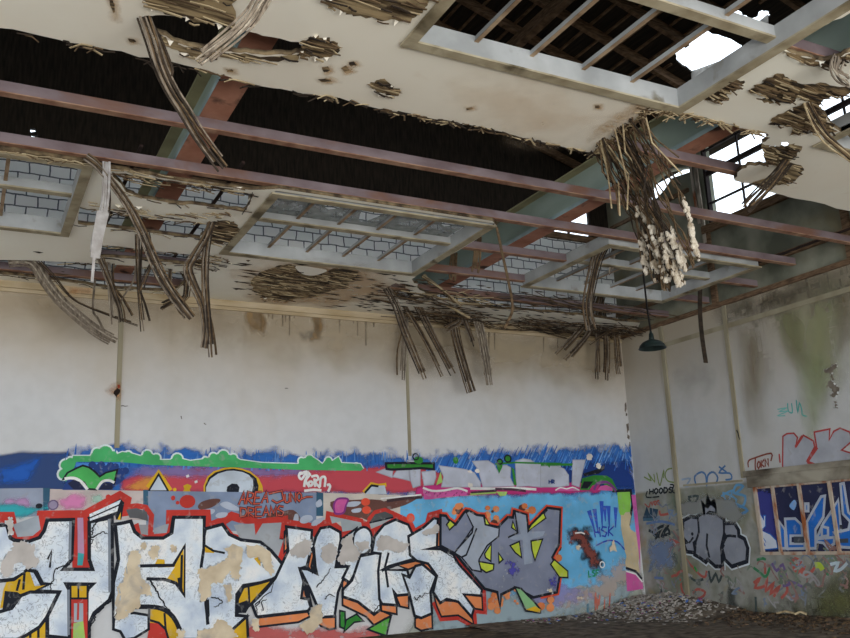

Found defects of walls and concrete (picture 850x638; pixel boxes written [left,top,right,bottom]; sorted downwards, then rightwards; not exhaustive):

flaking render [142,0,236,30]
flaking render [320,0,439,26]
flaking render [151,34,343,89]
flaking render [292,73,850,190]
flaking render [50,169,586,328]
water stain [393,326,616,372]
peeling [0,517,40,578]
peeling [114,541,177,621]
peeling [197,544,275,603]
peeling [289,534,410,565]
peeling [299,604,324,635]